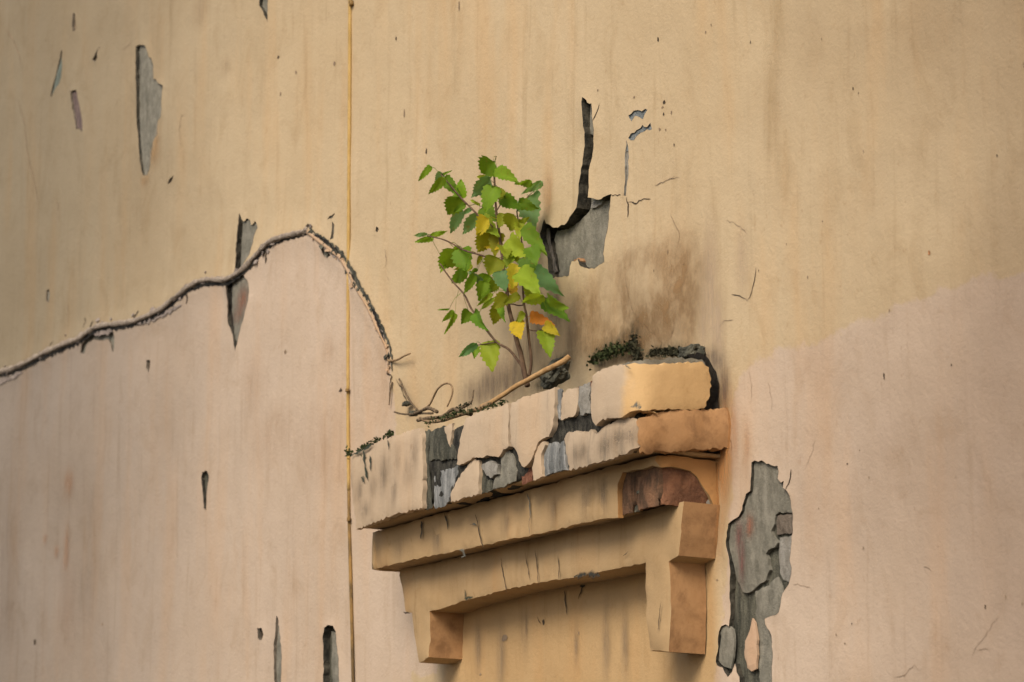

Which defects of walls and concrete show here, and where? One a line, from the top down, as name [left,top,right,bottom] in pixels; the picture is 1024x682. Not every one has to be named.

peeling [135,45,163,175]
peeling [540,97,611,278]
peeling [624,96,666,195]
crack [0,218,407,401]
peeling [225,213,257,349]
damp [576,252,692,365]
peeling [201,471,209,510]
flaking render [429,423,459,509]
flaking render [481,441,569,494]
peeling [716,460,793,682]
peeling [257,615,282,682]
peeling [322,625,339,682]